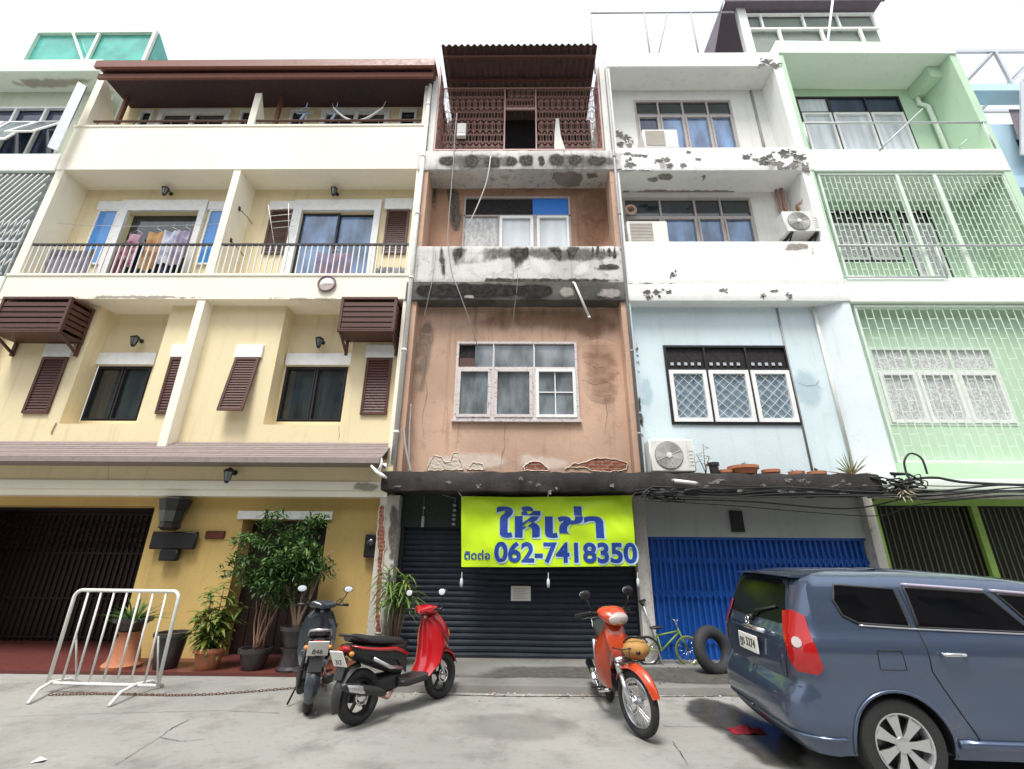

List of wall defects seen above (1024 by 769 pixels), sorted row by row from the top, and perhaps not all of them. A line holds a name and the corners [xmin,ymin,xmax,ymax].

mould [439,154,617,169]
peeling [615,130,701,172]
peeling [742,148,810,173]
leakage [416,195,621,298]
peeling [628,269,677,301]
flaking render [427,452,485,484]
flaking render [518,461,558,494]
flaking render [565,458,628,487]
flaking render [374,504,386,634]